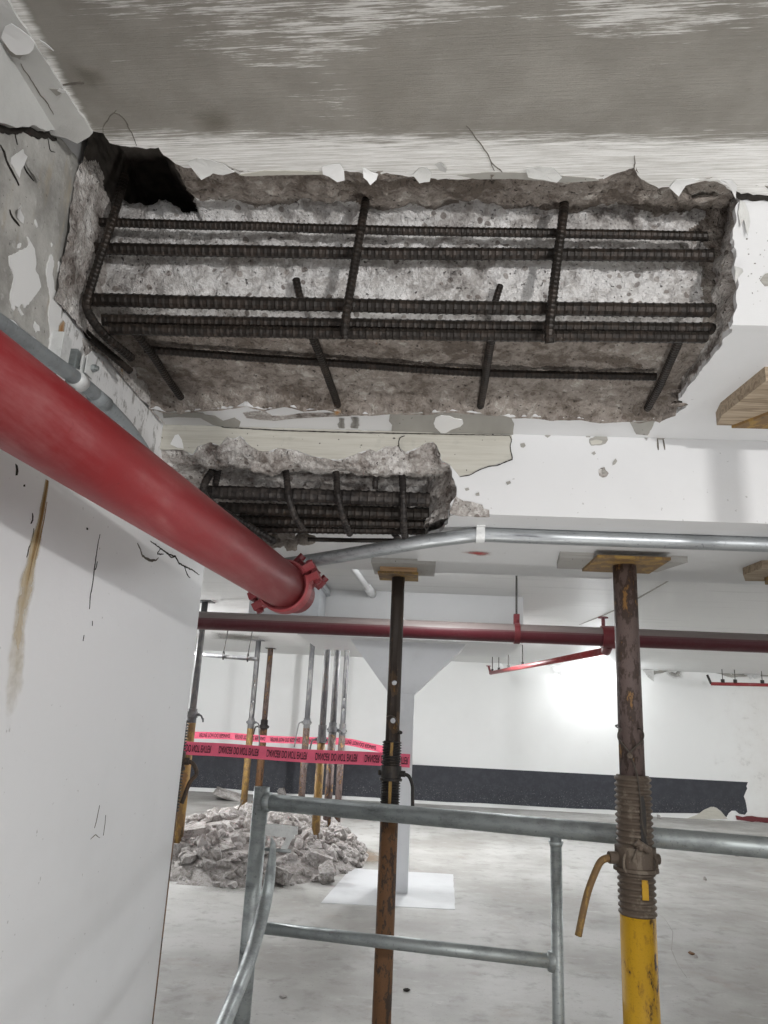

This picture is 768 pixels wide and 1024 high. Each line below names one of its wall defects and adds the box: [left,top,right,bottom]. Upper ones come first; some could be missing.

crack [21,64,84,152]
spalling [0,0,750,551]
crack [83,535,100,641]
crack [137,541,200,578]